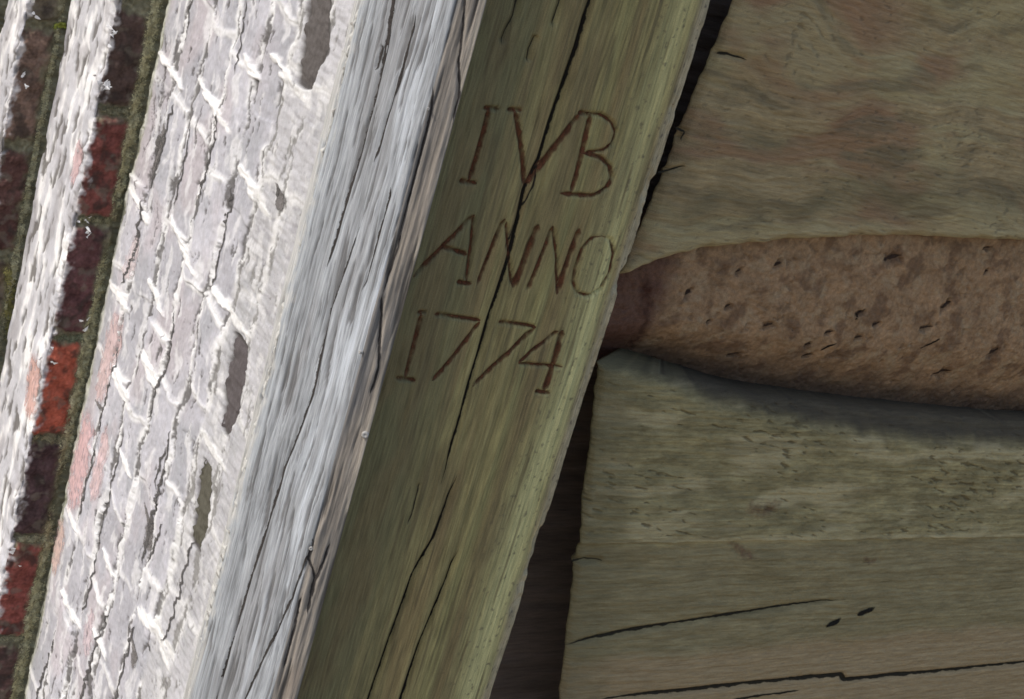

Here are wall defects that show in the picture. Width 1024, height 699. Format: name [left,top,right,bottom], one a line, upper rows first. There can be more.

crack [367,0,590,699]
crack [565,599,846,645]
crack [604,661,1024,699]